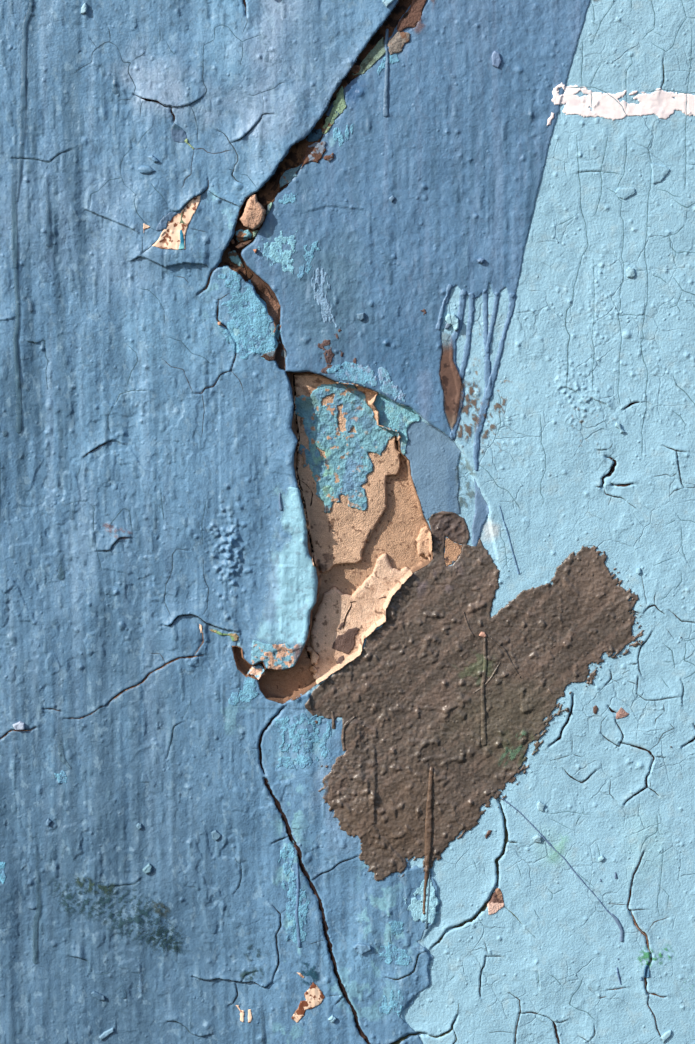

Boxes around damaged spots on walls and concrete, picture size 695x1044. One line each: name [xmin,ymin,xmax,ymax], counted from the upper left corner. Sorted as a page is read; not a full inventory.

peeling [143,195,201,250]
crack [77,0,427,329]
crack [69,346,146,571]
crack [164,336,243,432]
flaking render [199,230,433,706]
crack [195,0,695,1044]
peeling [272,713,332,770]
peeling [291,972,325,1023]